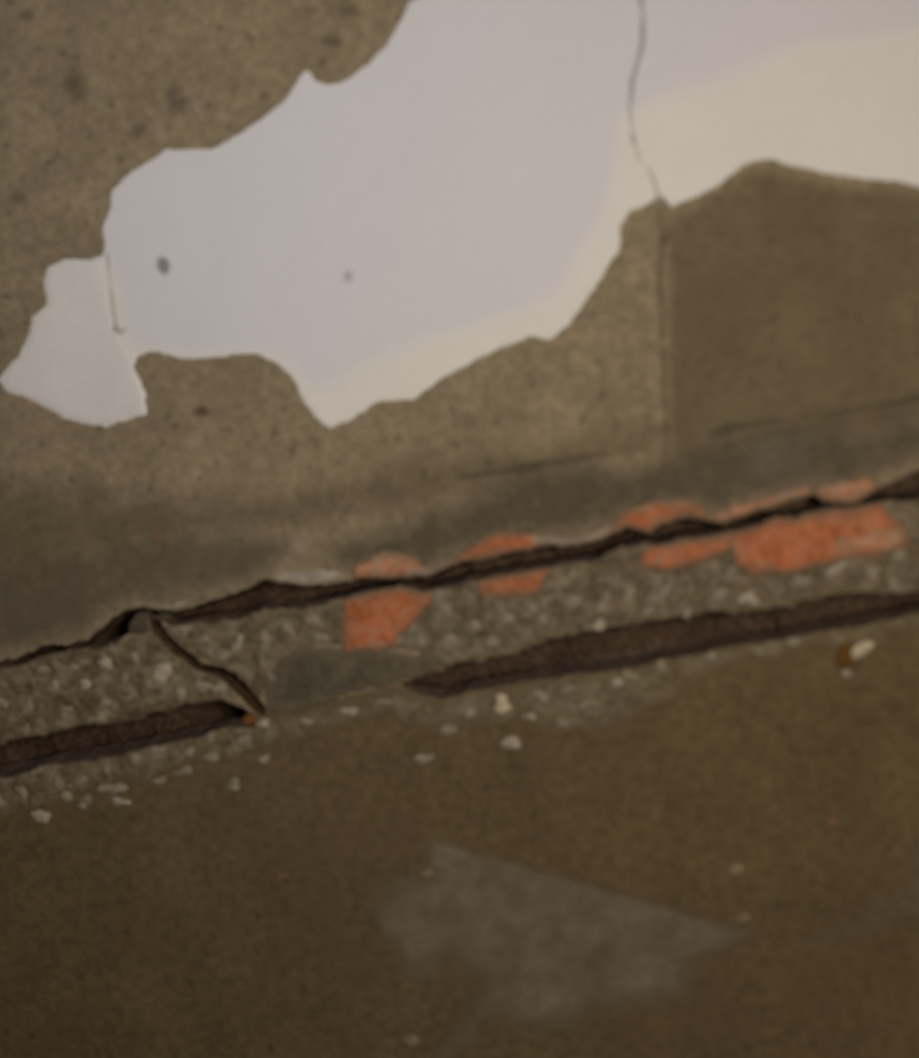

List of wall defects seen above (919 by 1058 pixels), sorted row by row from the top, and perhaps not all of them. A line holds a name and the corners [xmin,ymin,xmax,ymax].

crack [630,0,645,100]
peeling [0,0,919,428]
crack [0,470,919,778]